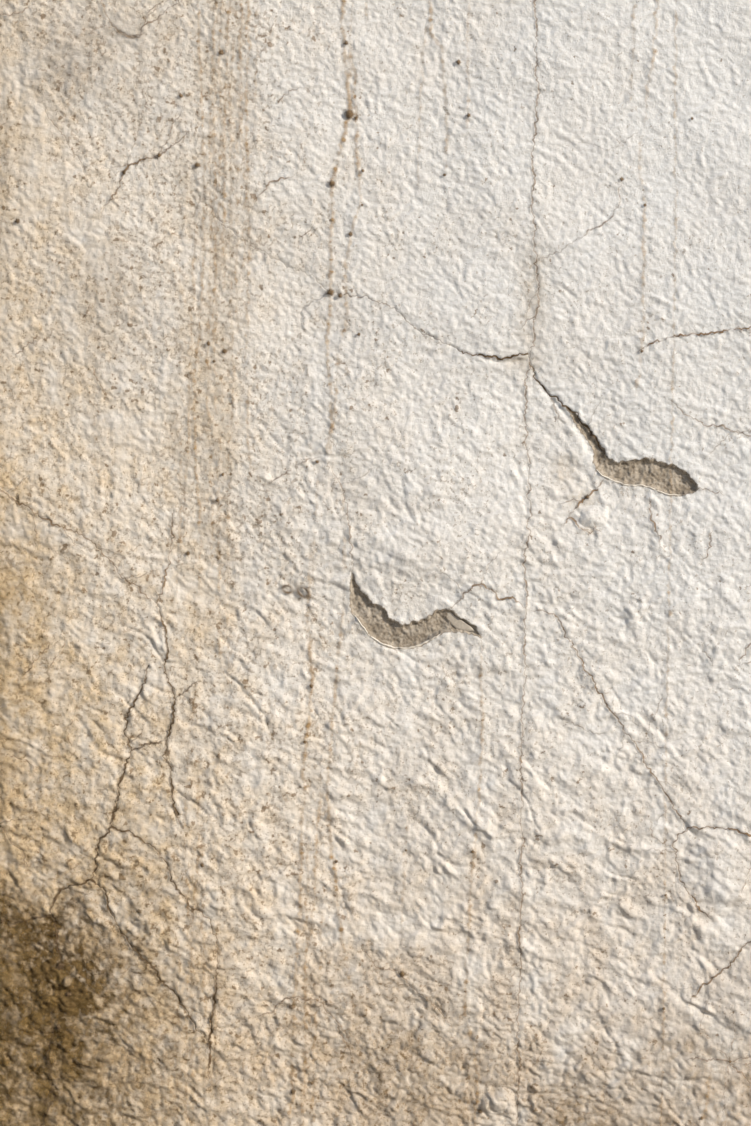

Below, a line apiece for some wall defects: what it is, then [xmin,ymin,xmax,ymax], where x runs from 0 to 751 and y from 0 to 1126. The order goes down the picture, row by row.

crack [410,0,751,916]
flaking render [566,407,699,497]
flaking render [349,573,481,649]
crack [0,489,218,1069]
damp [0,893,132,1126]
crack [516,838,525,1105]
crack [696,941,751,995]